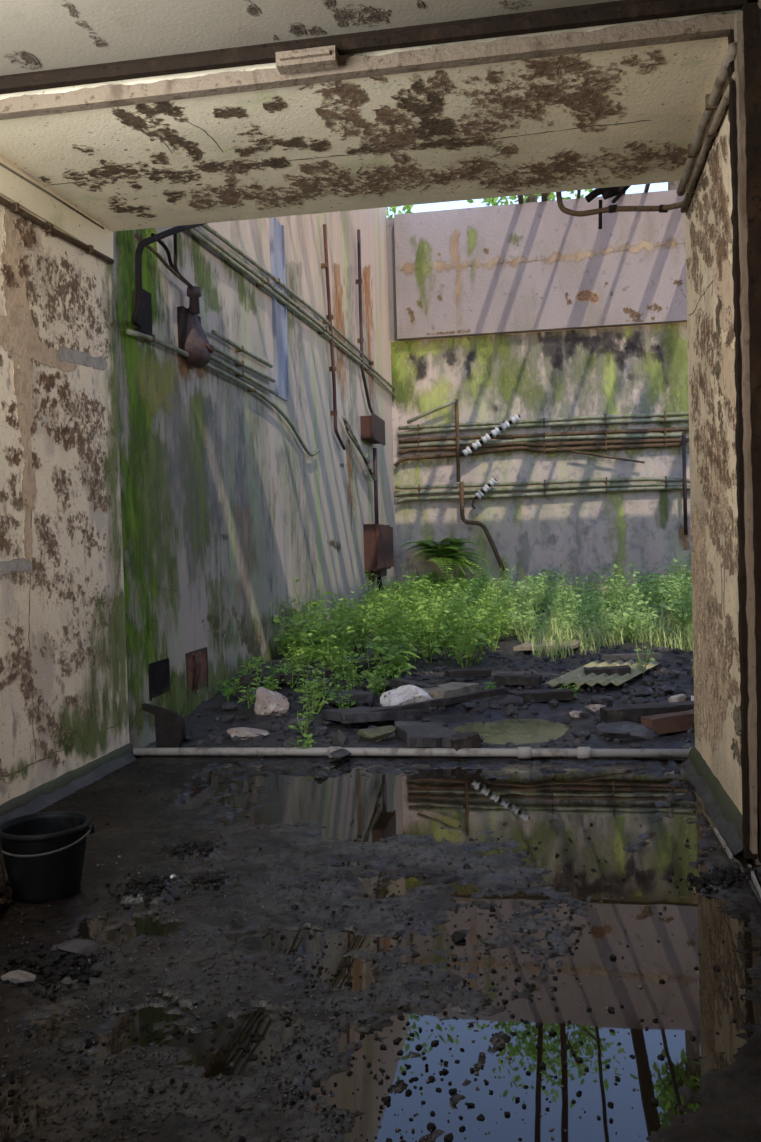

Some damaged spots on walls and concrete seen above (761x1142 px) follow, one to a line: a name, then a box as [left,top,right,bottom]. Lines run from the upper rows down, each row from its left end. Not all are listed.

peeling [55,0,107,48]
peeling [243,0,262,17]
peeling [272,0,391,40]
peeling [4,51,43,70]
peeling [38,47,688,218]
leakage [391,340,426,403]
leakage [443,346,486,380]
leakage [538,324,689,433]
leakage [59,228,314,759]
leakage [659,482,669,528]
leakage [608,477,626,585]